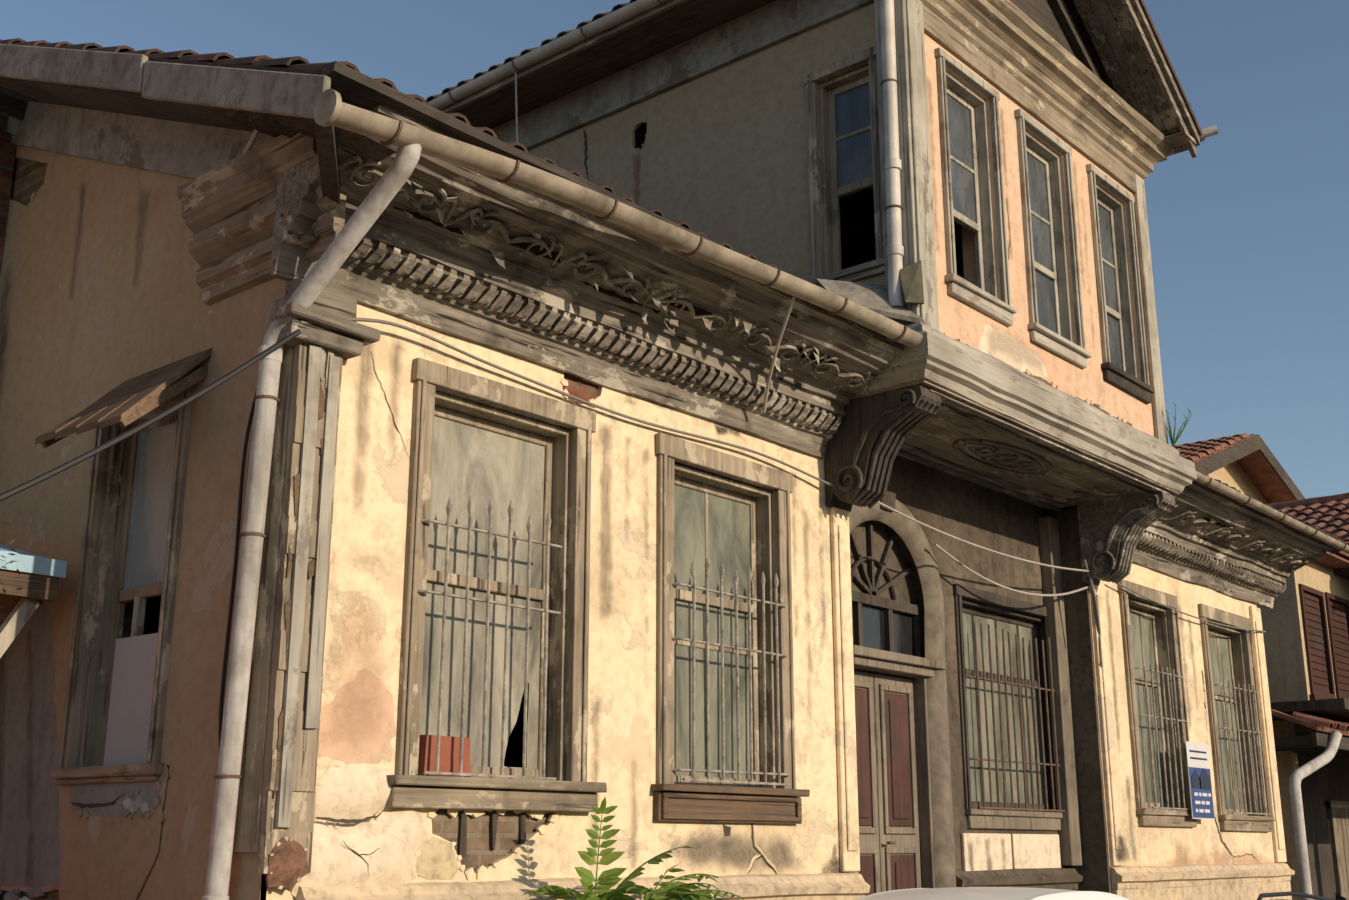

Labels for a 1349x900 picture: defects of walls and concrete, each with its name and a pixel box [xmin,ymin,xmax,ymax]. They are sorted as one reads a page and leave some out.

hole [629,121,647,151]
peeling [403,180,479,243]
peeling [490,248,523,268]
peeling [621,263,678,333]
peeling [735,317,781,372]
crack [371,351,407,452]
spalling [560,373,599,408]
flaking render [0,601,162,900]
crack [71,793,125,809]
crack [132,765,173,900]
spalling [416,808,560,880]